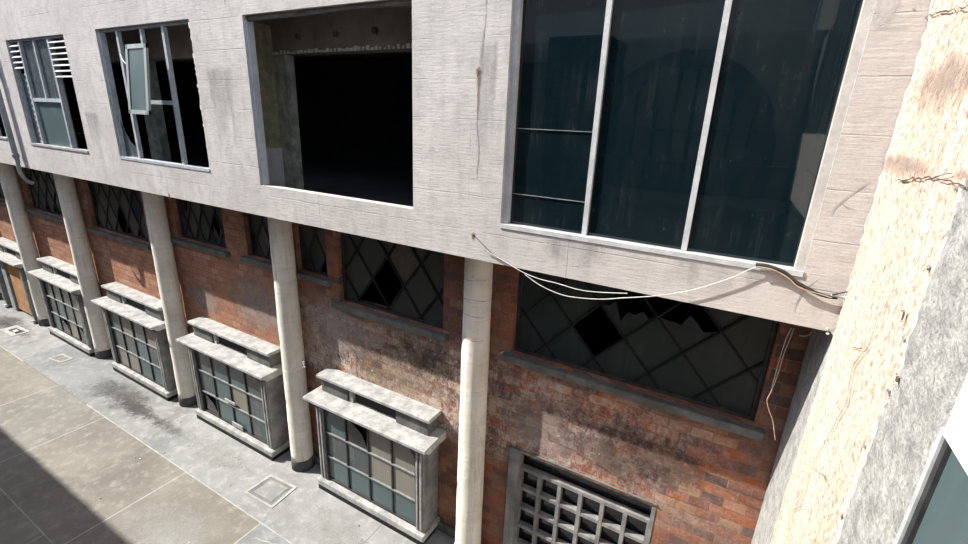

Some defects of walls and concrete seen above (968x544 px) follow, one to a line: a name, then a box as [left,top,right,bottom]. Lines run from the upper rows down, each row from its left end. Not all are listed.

crack [925,5,968,18]
crack [895,173,968,196]